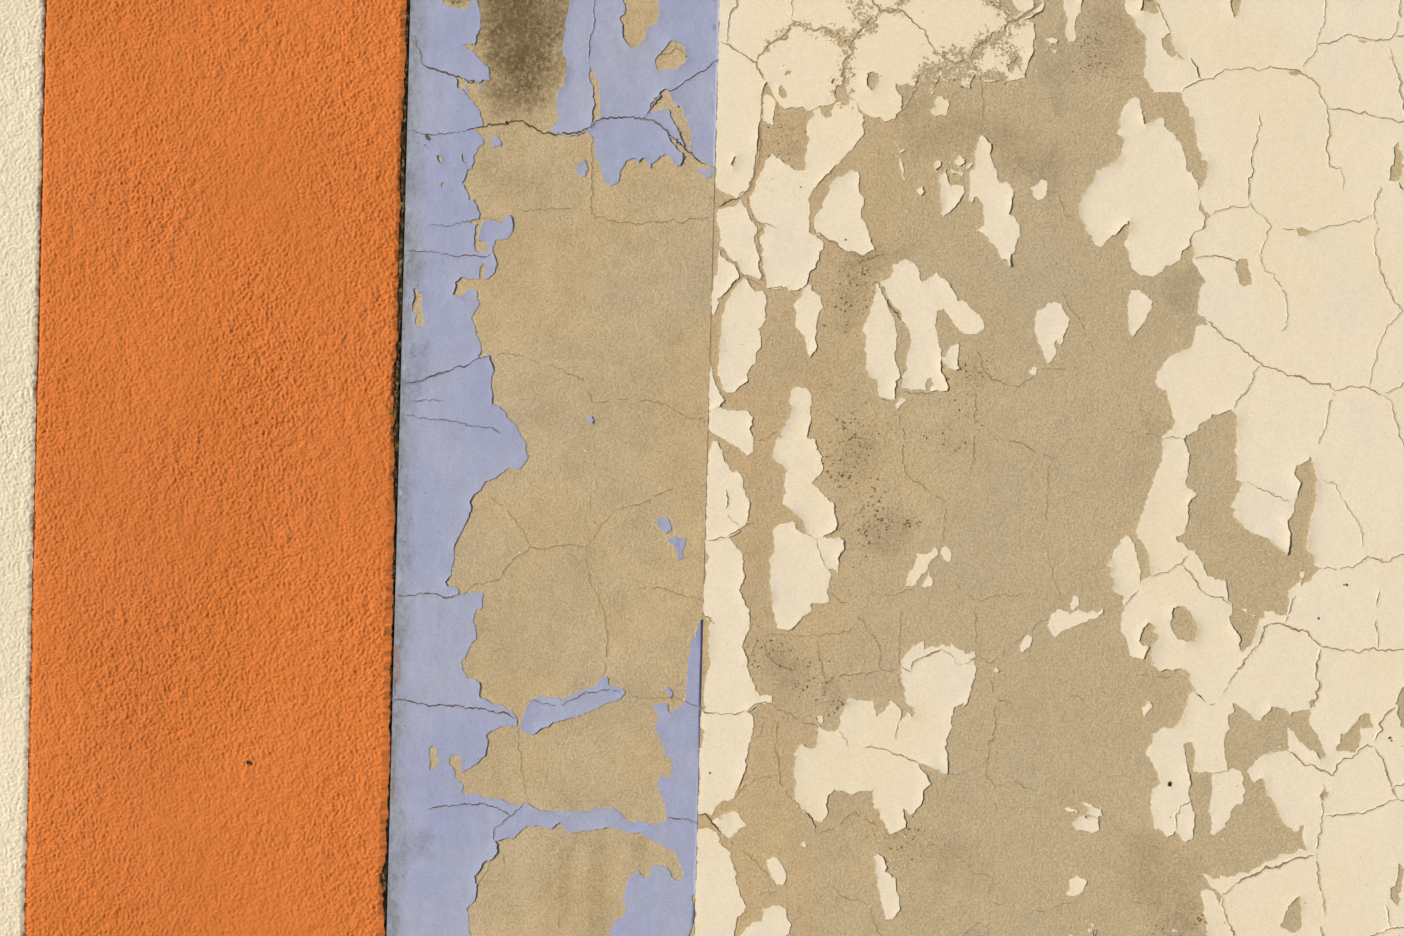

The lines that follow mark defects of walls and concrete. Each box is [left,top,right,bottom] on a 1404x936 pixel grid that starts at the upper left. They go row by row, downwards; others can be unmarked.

peeling [412,289,424,328]
damp [482,0,566,105]
crack [406,0,1043,299]
crack [811,220,905,325]
crack [1126,0,1404,449]
peeling [1389,142,1404,182]
peeling [429,0,1373,936]
crack [392,272,1094,909]
crack [1123,478,1404,707]
crack [1220,706,1404,936]
peeling [1390,864,1404,906]
peeling [1396,687,1404,728]